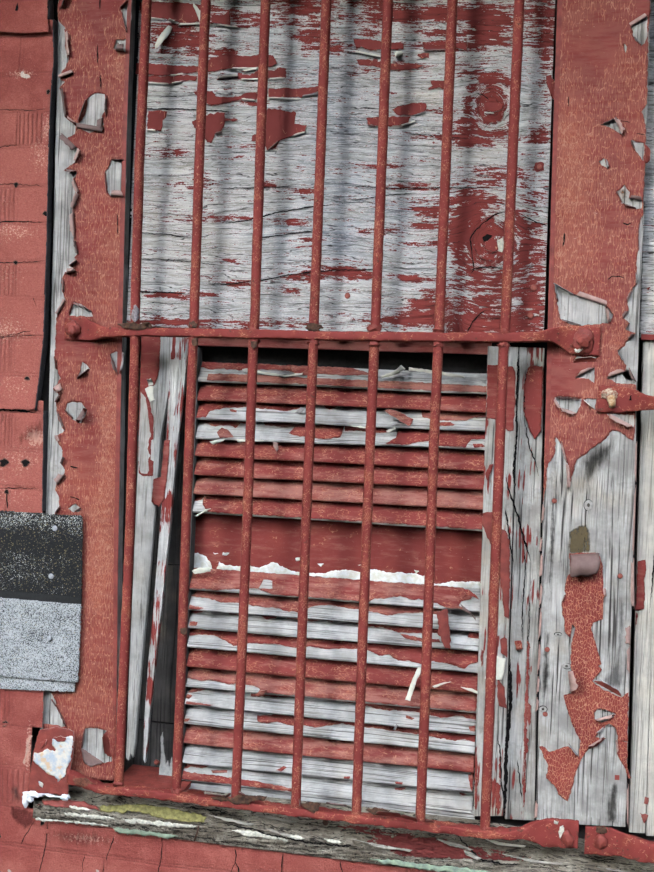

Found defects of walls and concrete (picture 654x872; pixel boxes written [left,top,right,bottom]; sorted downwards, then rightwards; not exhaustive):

peeling [47,22,107,513]
rust [118,322,152,330]
rust [305,323,323,331]
peeling [196,406,486,451]
peeling [534,413,637,827]
peeling [184,552,506,753]
peeling [33,690,112,782]
rust [187,788,267,805]
rust [299,799,347,813]
peeling [183,744,472,813]
rust [365,807,434,823]
crack [21,822,48,872]